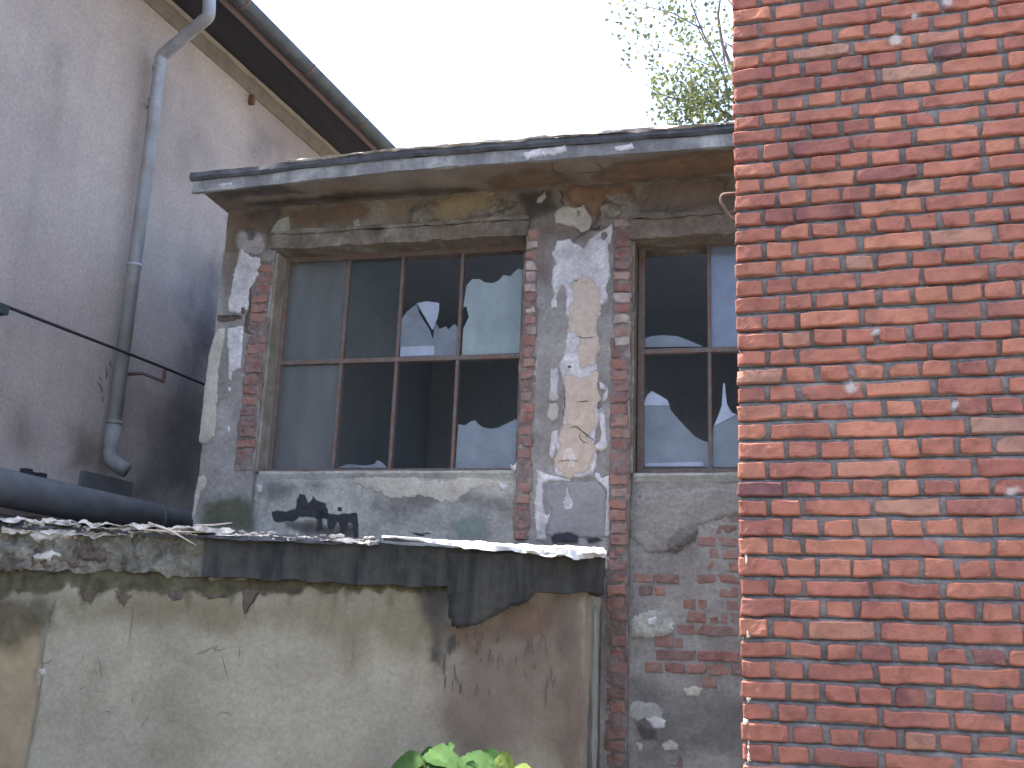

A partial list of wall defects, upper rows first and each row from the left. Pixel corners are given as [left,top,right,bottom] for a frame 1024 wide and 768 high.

spalling [199,217,290,471]
spalling [0,528,127,573]
peeling [192,475,207,520]
leakage [0,569,455,659]
spalling [354,192,683,768]
spalling [645,514,743,697]